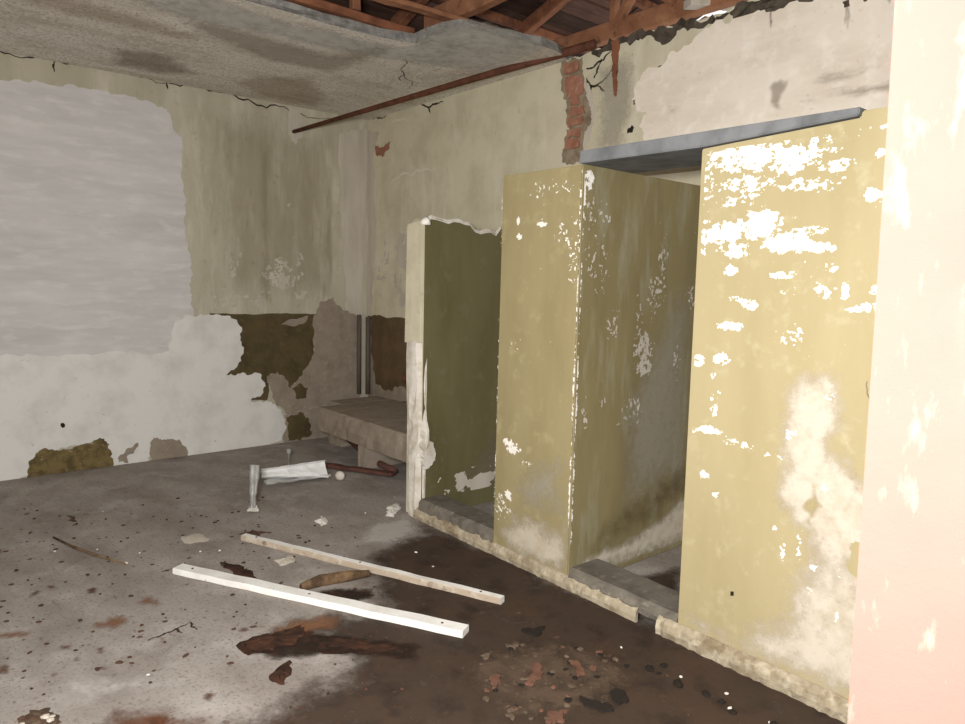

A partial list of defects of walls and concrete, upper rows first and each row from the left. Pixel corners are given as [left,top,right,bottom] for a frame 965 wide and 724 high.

crack [586,51,612,92]
peeling [627,0,895,141]
flaking render [530,57,612,329]
peeling [701,135,856,276]
peeling [195,252,407,442]
peeling [814,282,877,313]
peeling [27,438,188,477]
peeling [437,438,530,520]
spalling [568,343,587,545]
peeling [692,390,783,460]
water stain [746,376,863,689]
water stain [263,517,845,724]